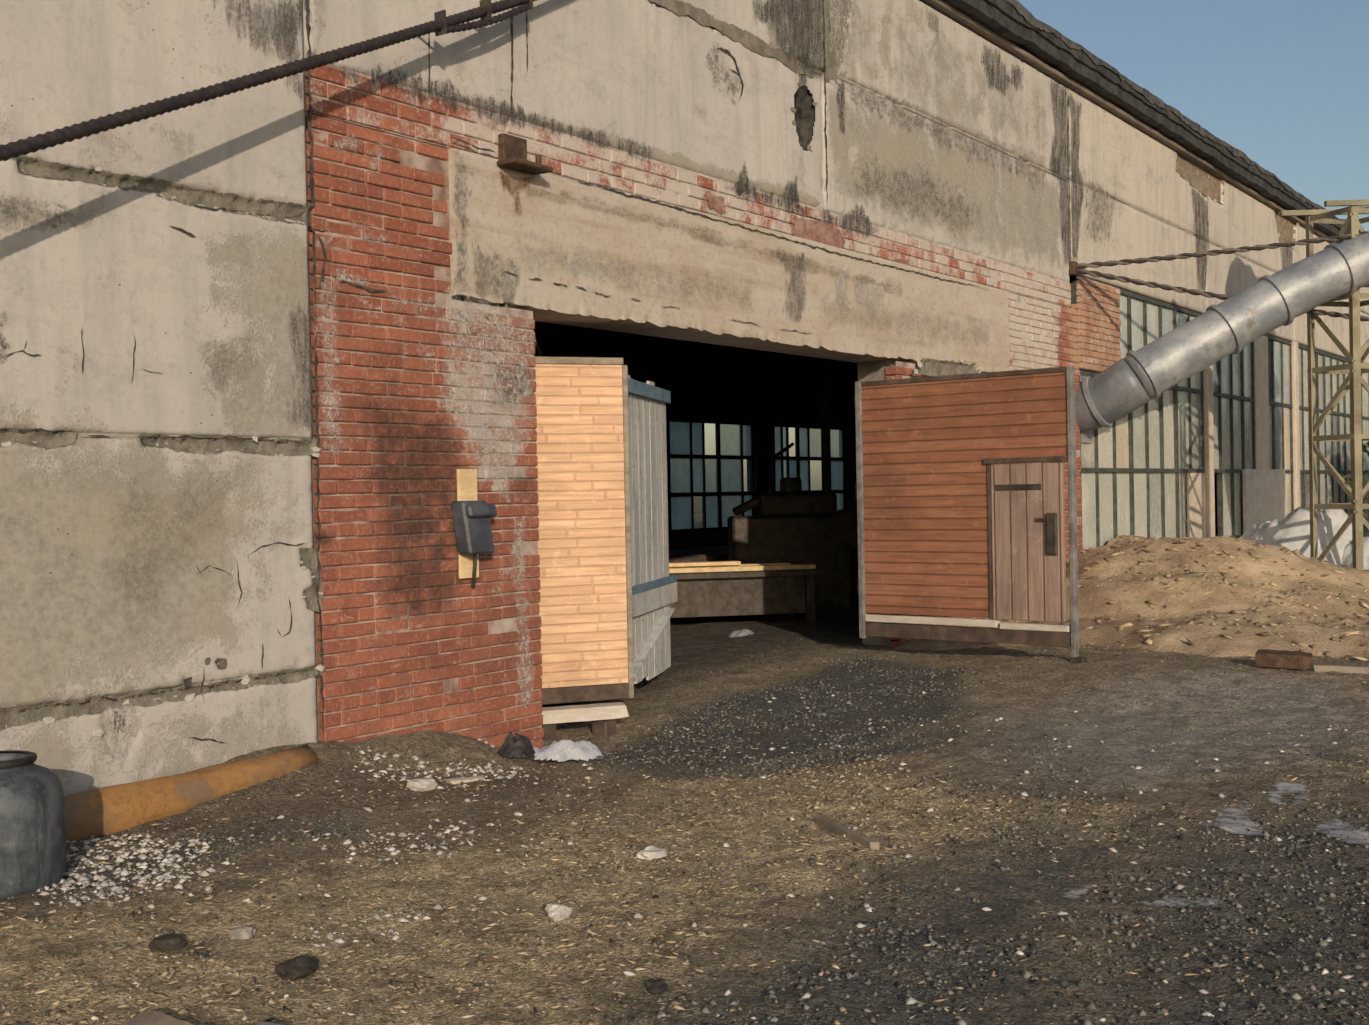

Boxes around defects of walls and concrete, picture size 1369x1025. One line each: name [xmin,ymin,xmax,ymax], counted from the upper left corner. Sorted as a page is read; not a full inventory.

water stain [214,0,303,97]
crack [452,138,496,153]
spalling [706,192,726,215]
crack [550,7,988,290]
spalling [791,217,845,249]
water stain [726,0,1115,263]
spalling [1176,152,1225,205]
crack [0,0,387,733]
water stain [389,164,534,502]
spalling [299,547,323,612]
water stain [512,517,532,707]
crack [190,736,224,744]